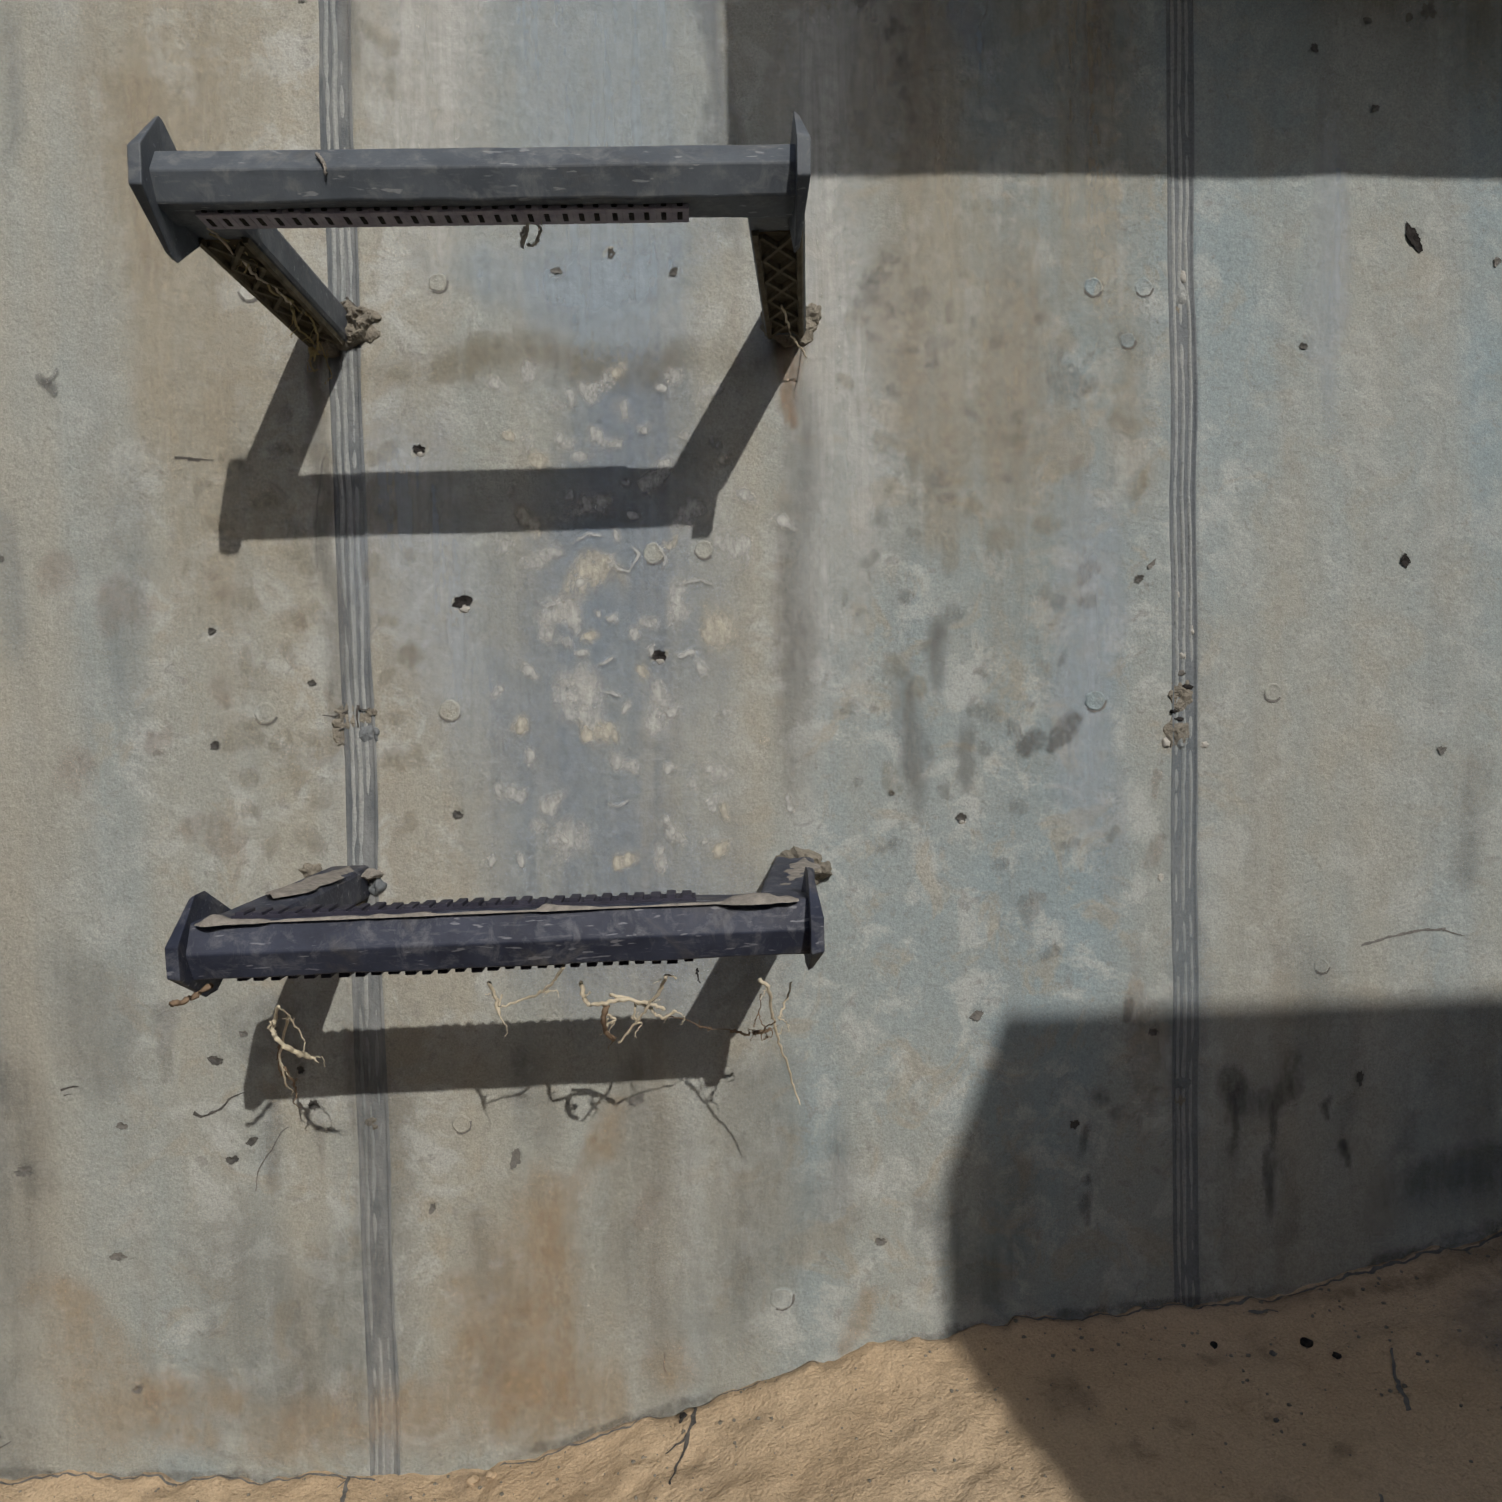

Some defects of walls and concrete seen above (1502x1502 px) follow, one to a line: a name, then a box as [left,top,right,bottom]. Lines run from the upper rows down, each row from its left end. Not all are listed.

leakage [562,369,621,408]
leakage [539,530,640,773]
leakage [630,579,706,736]
leakage [679,615,732,673]
leakage [613,853,635,870]
leakage [655,817,728,869]